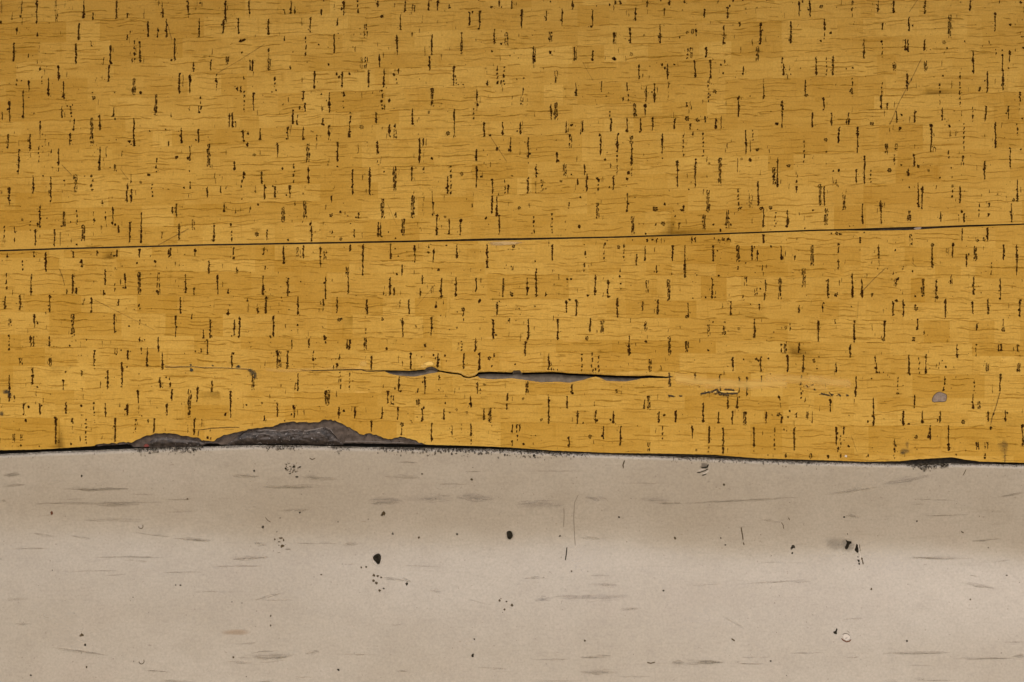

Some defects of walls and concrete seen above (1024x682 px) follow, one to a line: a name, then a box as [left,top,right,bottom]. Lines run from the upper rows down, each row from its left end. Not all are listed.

crack [303,362,786,387]
spalling [96,419,423,448]